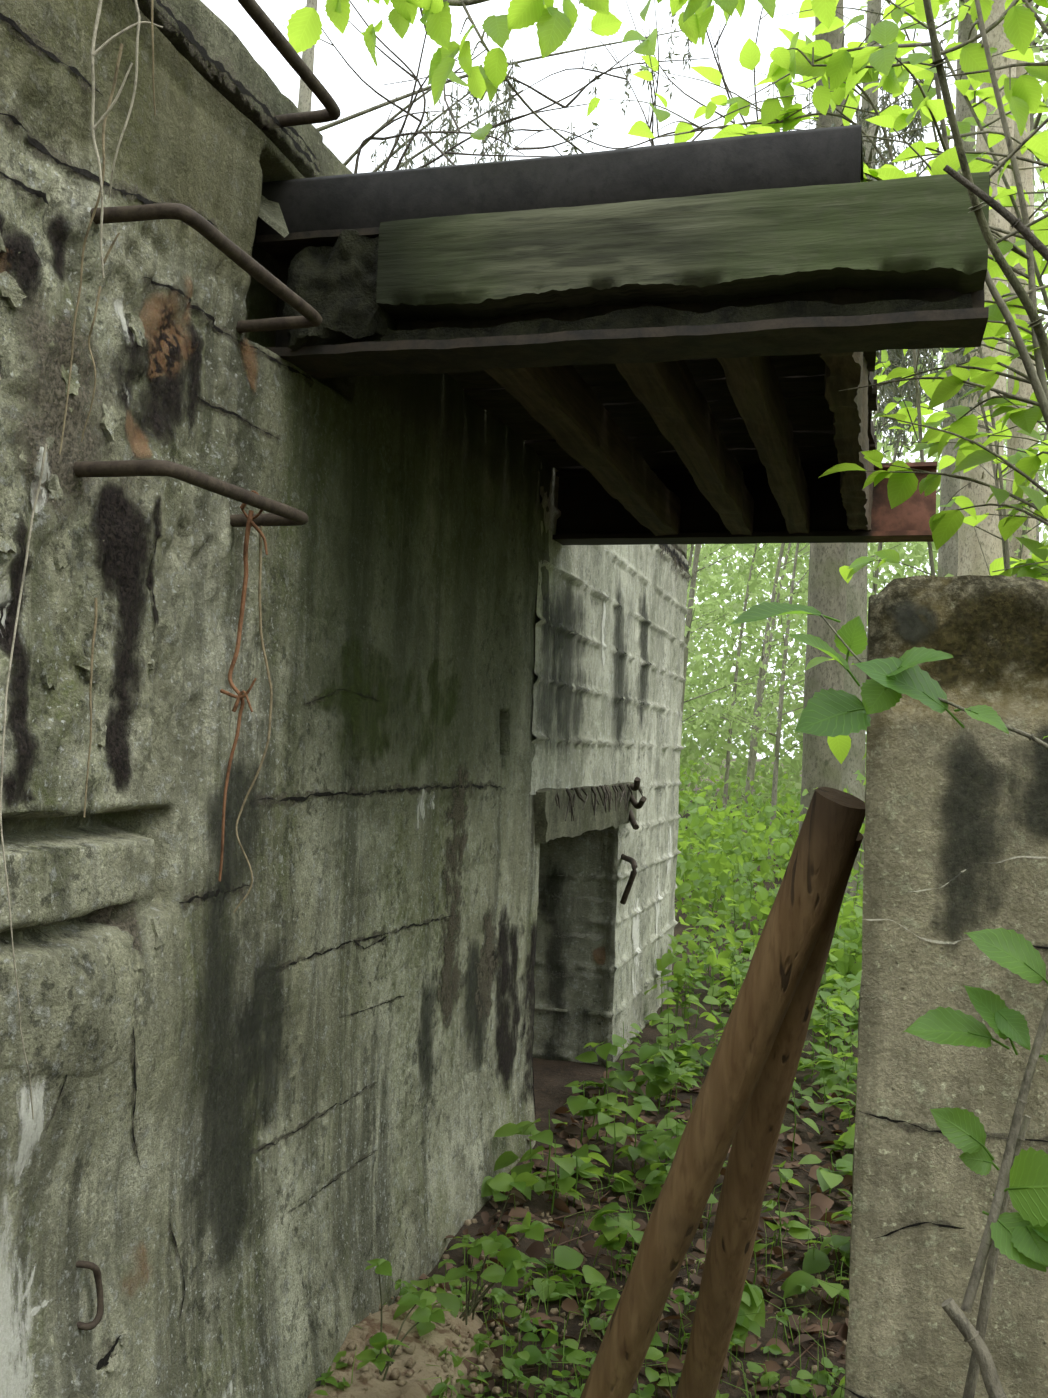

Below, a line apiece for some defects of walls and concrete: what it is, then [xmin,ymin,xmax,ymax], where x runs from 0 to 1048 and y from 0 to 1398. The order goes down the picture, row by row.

corrosion [143,297,188,376]
corrosion [126,414,151,456]
damp [92,482,162,790]
crack [249,780,505,806]
crack [179,884,249,910]
crack [257,914,457,978]
crack [346,996,404,1016]
crack [251,1082,377,1154]
crack [855,1109,942,1133]
crack [985,1132,1048,1144]
crack [289,1150,376,1212]
crack [839,1385,872,1398]